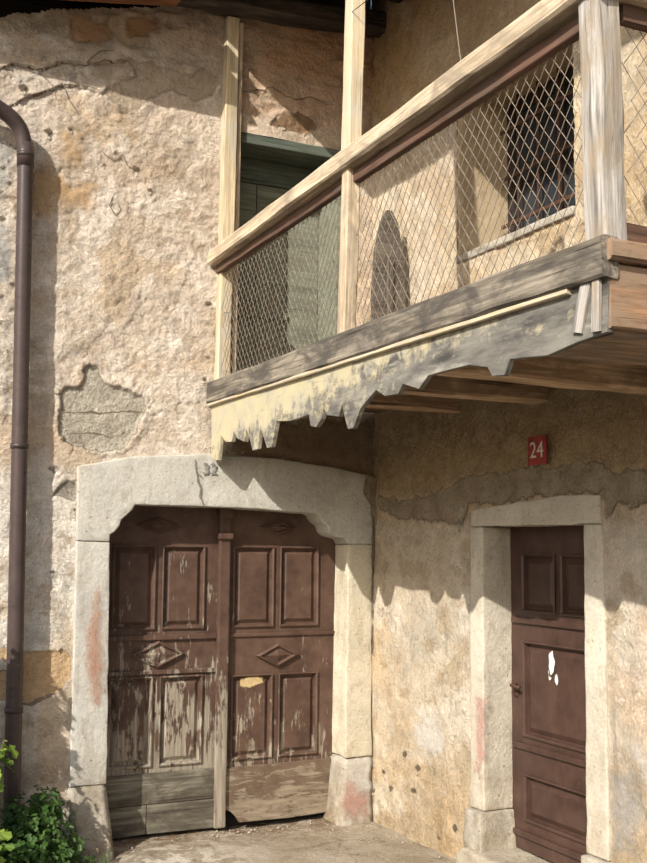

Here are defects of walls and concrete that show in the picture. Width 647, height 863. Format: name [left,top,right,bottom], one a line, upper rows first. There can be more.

crack [0,50,128,115]
spalling [55,361,149,453]
crack [195,459,204,506]
peeling [363,460,647,532]
peeling [22,648,73,706]